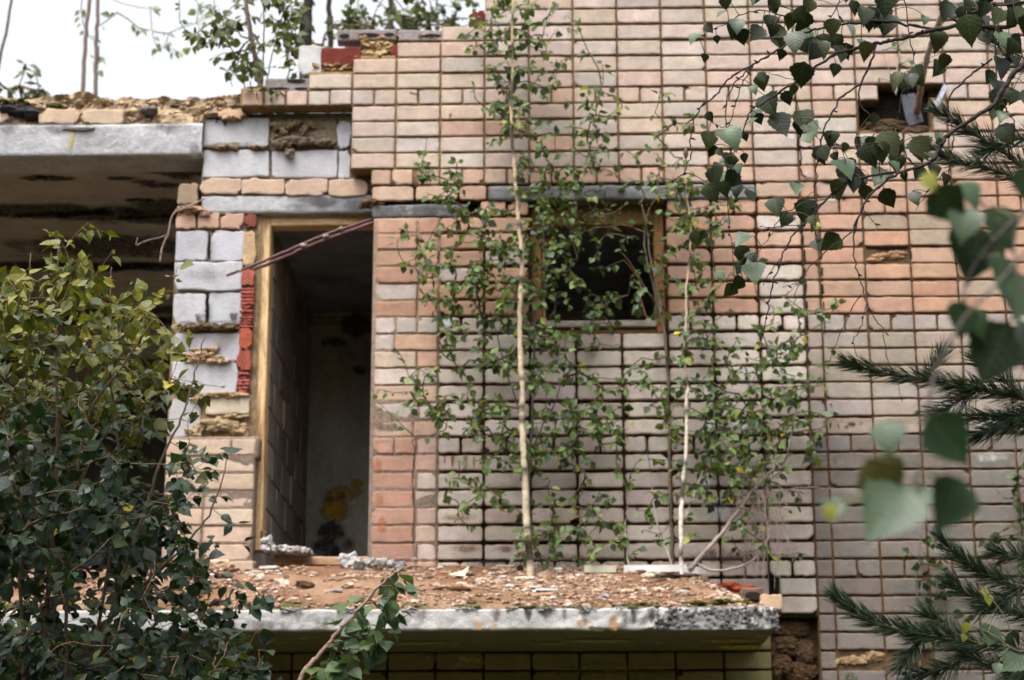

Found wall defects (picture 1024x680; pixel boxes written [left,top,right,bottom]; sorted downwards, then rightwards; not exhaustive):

spalling [858,91,931,137]
spalling [653,605,885,680]